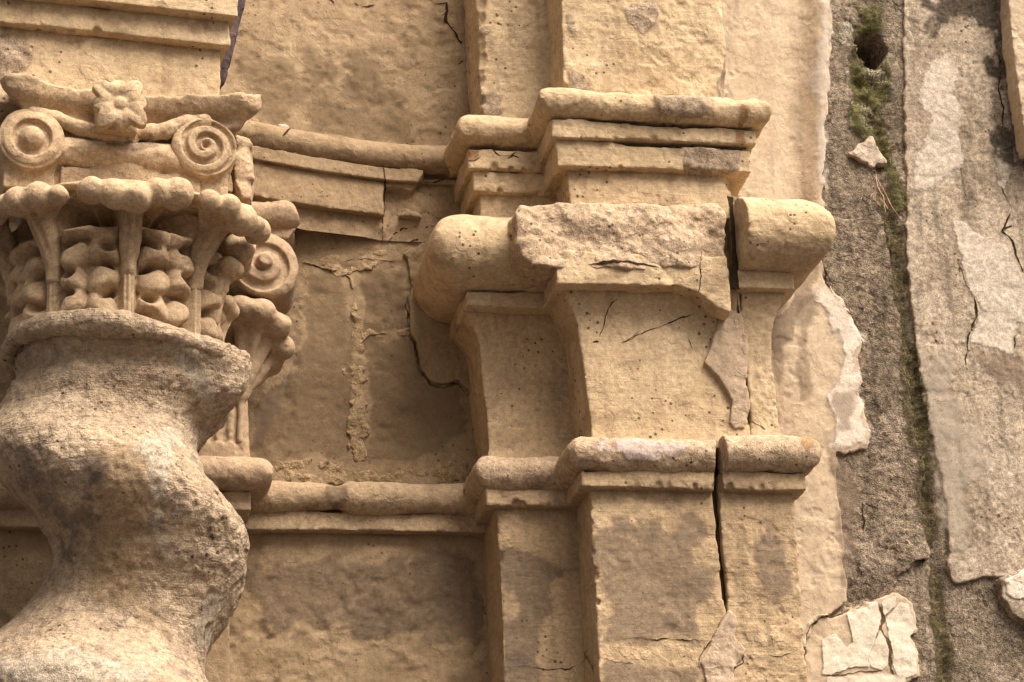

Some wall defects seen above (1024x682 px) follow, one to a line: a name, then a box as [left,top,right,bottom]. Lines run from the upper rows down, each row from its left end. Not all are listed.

crack [433,2,481,87]
crack [997,54,1005,131]
crack [996,162,1024,273]
crack [304,168,470,394]
crack [589,249,702,349]
crack [958,262,984,363]
flaking render [815,286,871,451]
crack [608,454,726,680]
peeling [804,593,920,682]